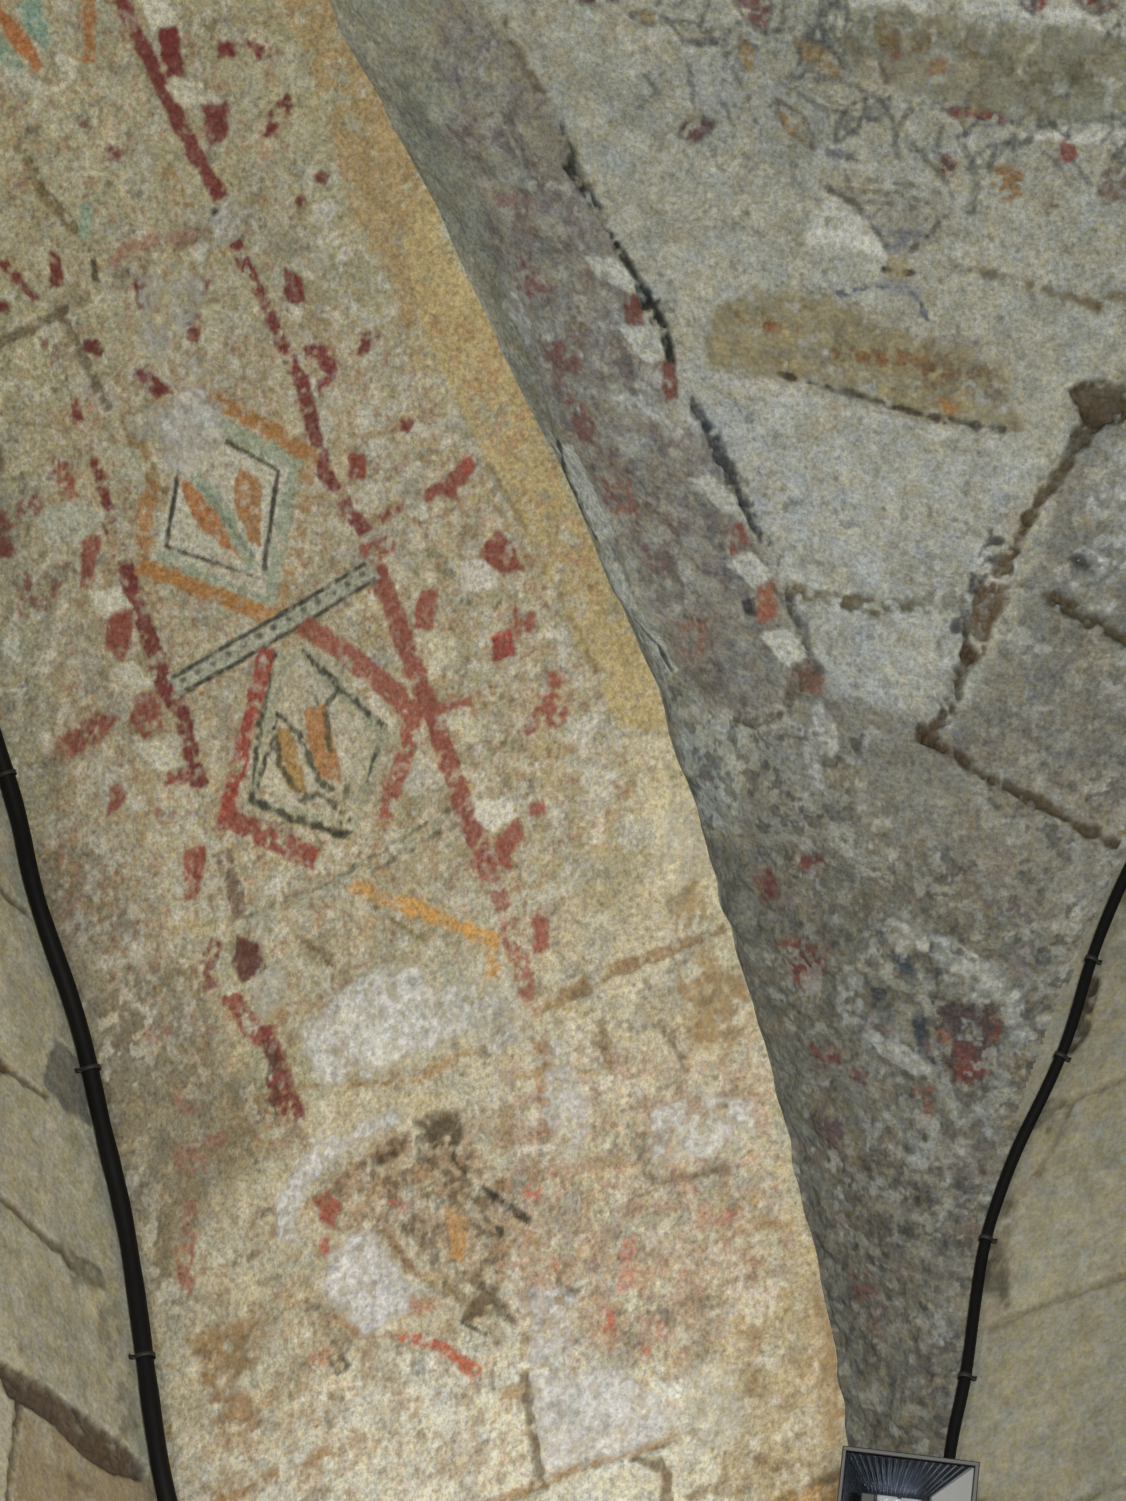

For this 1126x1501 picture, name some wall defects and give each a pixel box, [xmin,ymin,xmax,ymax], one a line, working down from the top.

crack [504,20,544,93]
crack [561,126,675,363]
crack [970,269,1033,288]
crack [1070,293,1126,311]
crack [691,398,762,540]
crack [917,381,1126,848]